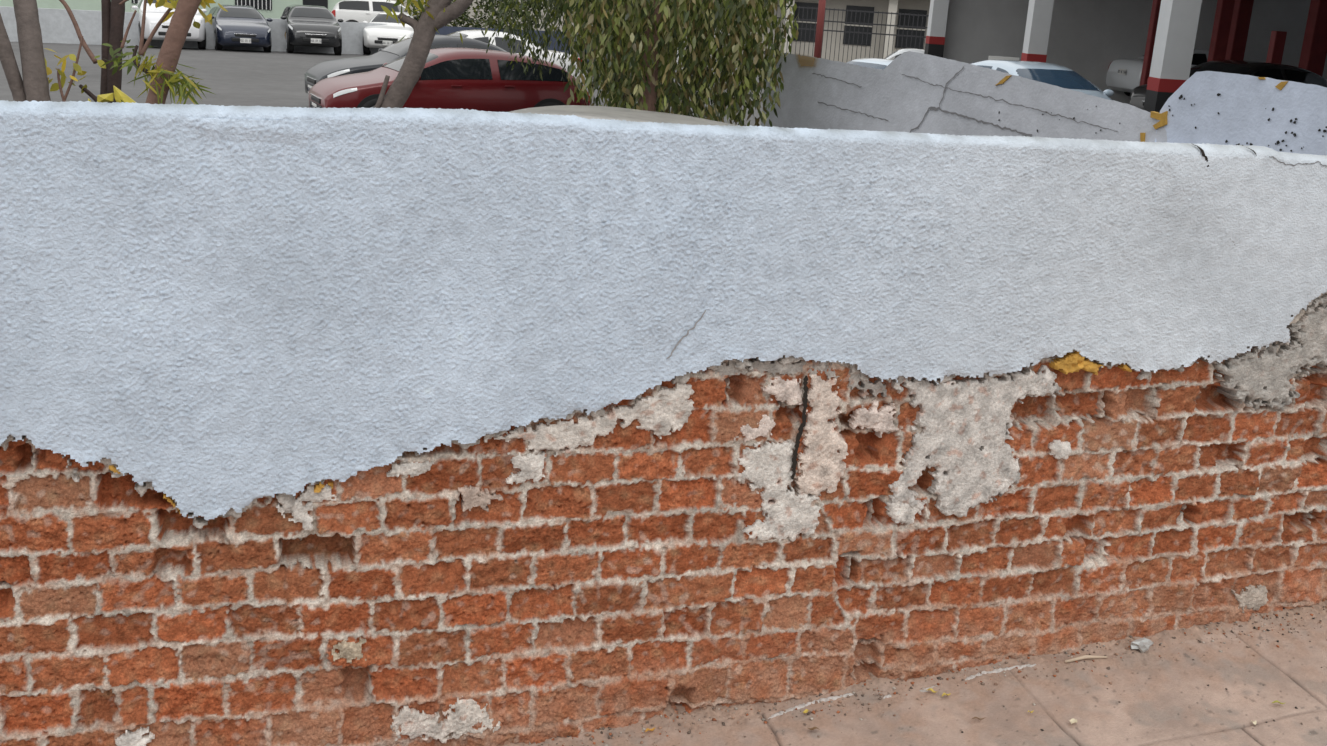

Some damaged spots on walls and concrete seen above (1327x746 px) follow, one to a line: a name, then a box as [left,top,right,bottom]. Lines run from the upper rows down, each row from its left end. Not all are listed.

crack [812,66,1118,137]
flaking render [0,292,1327,746]